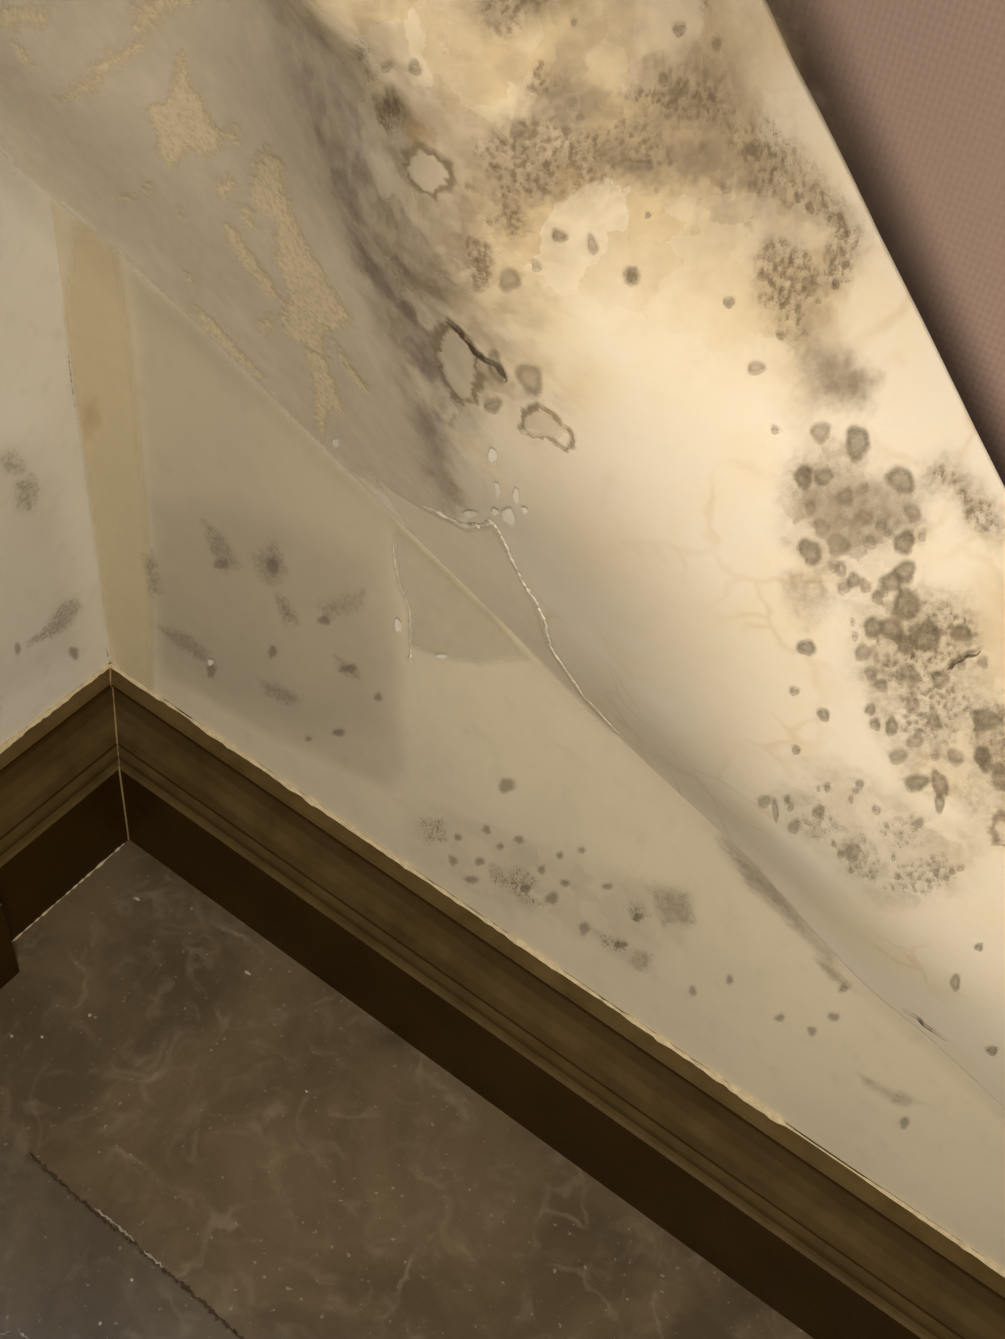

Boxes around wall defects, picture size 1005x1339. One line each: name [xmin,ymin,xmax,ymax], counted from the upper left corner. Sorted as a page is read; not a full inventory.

damp [0,0,455,521]
damp [486,125,653,250]
damp [738,131,858,340]
peeling [463,482,528,526]
damp [847,429,868,461]
damp [795,468,1005,813]
damp [989,811,1005,846]
peeling [95,1208,163,1267]